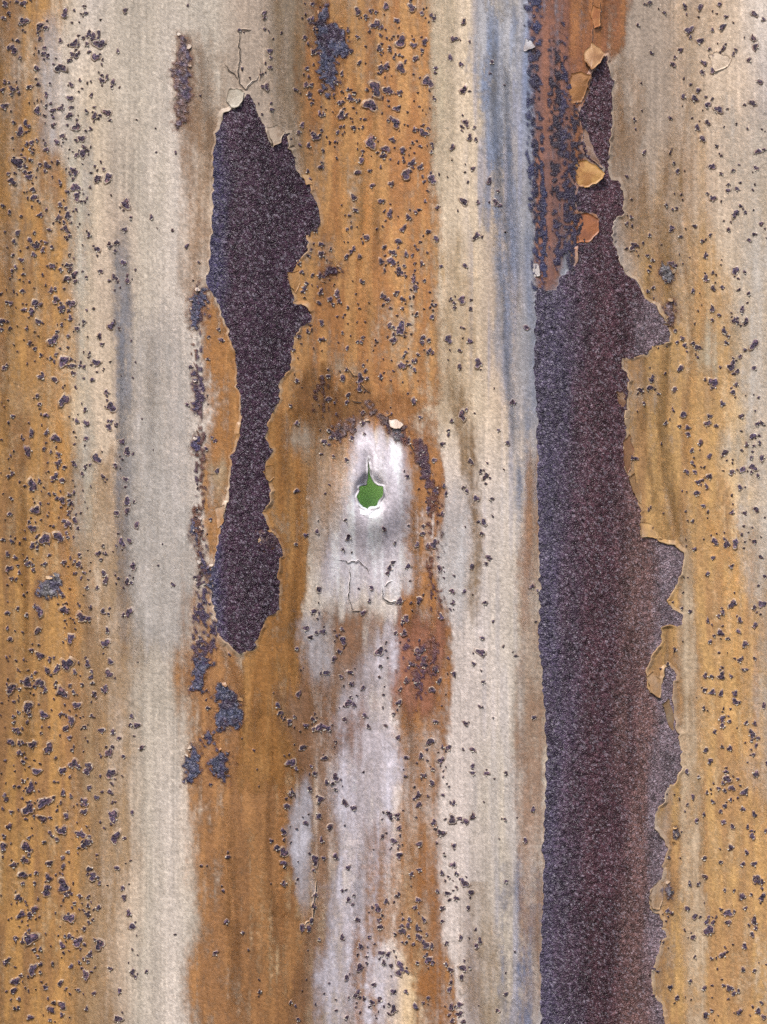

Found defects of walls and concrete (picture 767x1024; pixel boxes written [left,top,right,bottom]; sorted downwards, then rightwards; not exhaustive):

peeling [169,32,194,130]
crack [225,28,262,91]
peeling [306,0,407,131]
corrosion [524,0,640,291]
peeling [591,5,600,28]
corrosion [669,1,767,243]
corrosion [0,0,149,1024]
peeling [188,88,324,658]
corrosion [170,0,509,1024]
peeling [531,42,689,1024]
corrosion [624,224,767,1024]